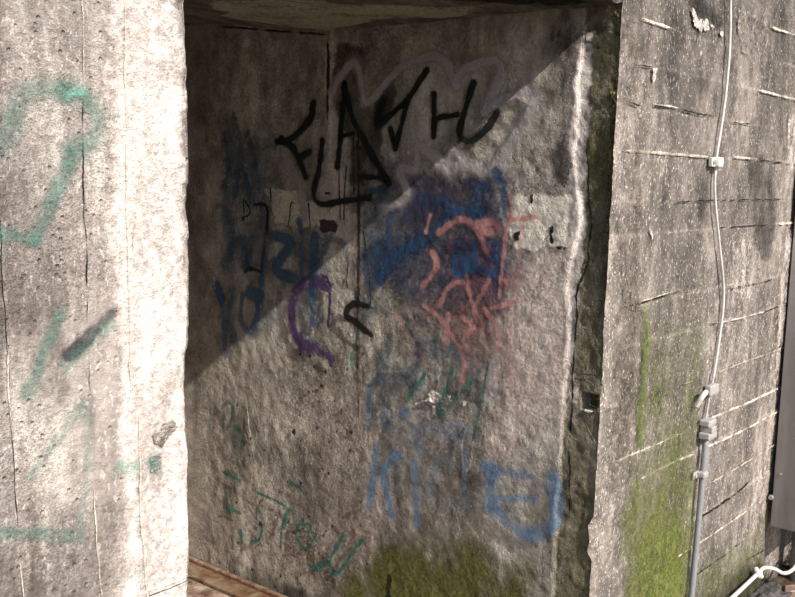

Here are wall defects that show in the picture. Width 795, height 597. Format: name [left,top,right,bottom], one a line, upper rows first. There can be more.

crack [79,47,87,122]
water stain [209,0,583,31]
water stain [693,0,723,25]
crack [0,221,18,530]
crack [81,143,89,284]
water stain [105,0,188,597]
water stain [333,43,396,290]
water stain [484,28,607,465]
crack [568,144,682,517]
crack [94,492,102,595]
water stain [722,561,776,597]